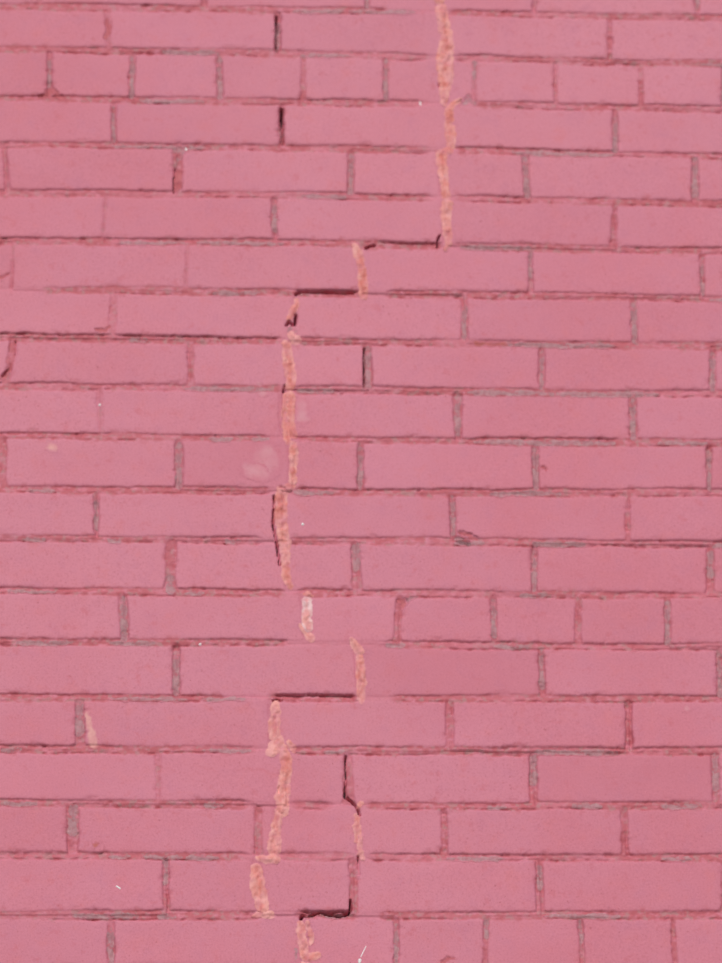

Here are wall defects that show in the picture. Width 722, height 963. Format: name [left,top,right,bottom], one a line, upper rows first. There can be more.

crack [434,0,463,252]
crack [351,242,369,301]
crack [272,297,316,643]
crack [349,636,368,705]
crack [249,700,323,963]
crack [343,761,366,863]